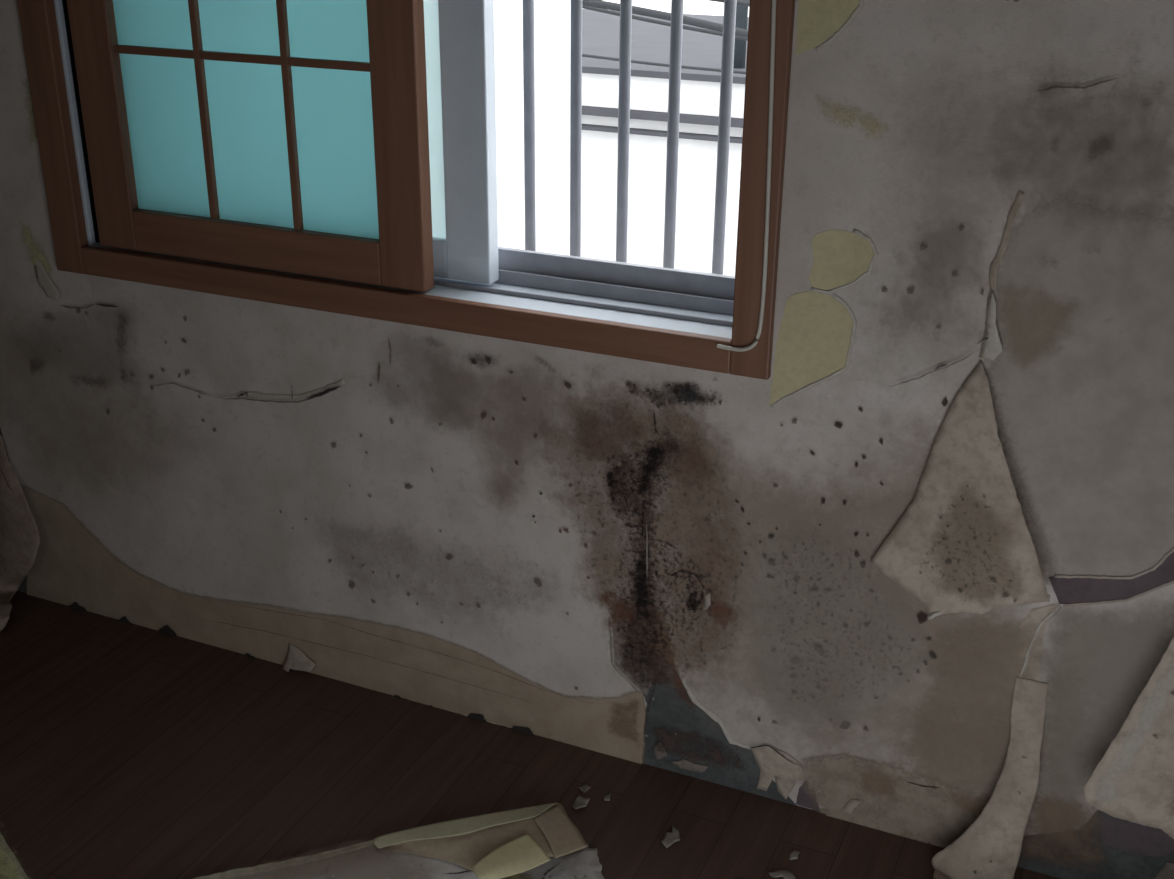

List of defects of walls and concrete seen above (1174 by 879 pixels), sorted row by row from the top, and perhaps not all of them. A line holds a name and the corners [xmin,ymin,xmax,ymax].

peeling [796,0,864,55]
crack [151,379,345,403]
peeling [769,229,878,408]
peeling [870,190,1174,620]
peeling [0,428,40,631]
peeling [283,643,316,672]
peeling [454,712,534,735]
water stain [21,380,1013,768]
peeling [609,596,797,806]
water stain [804,754,989,848]
peeling [931,637,1174,879]